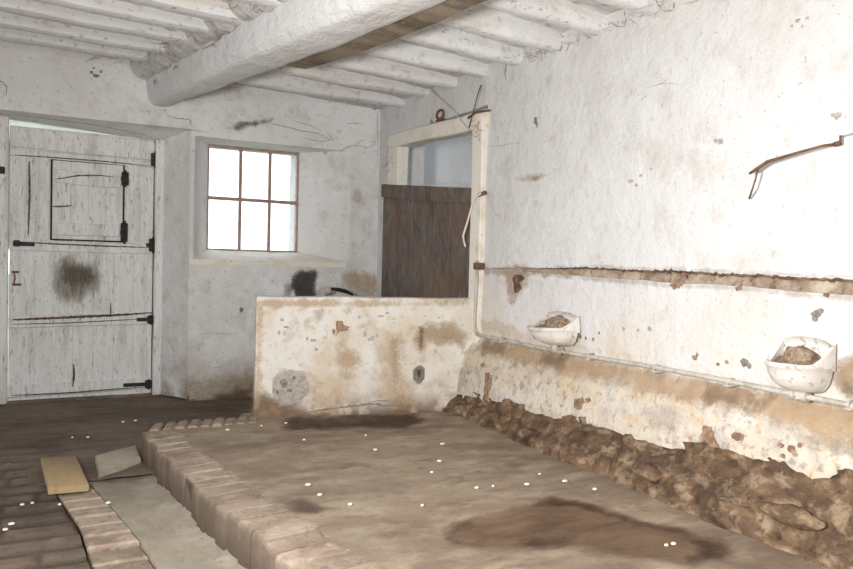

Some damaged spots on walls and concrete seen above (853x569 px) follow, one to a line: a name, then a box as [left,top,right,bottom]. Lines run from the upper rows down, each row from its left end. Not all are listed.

flaking render [492,266,853,298]
flaking render [811,308,824,322]
flaking render [272,370,309,404]
flaking render [442,363,853,569]